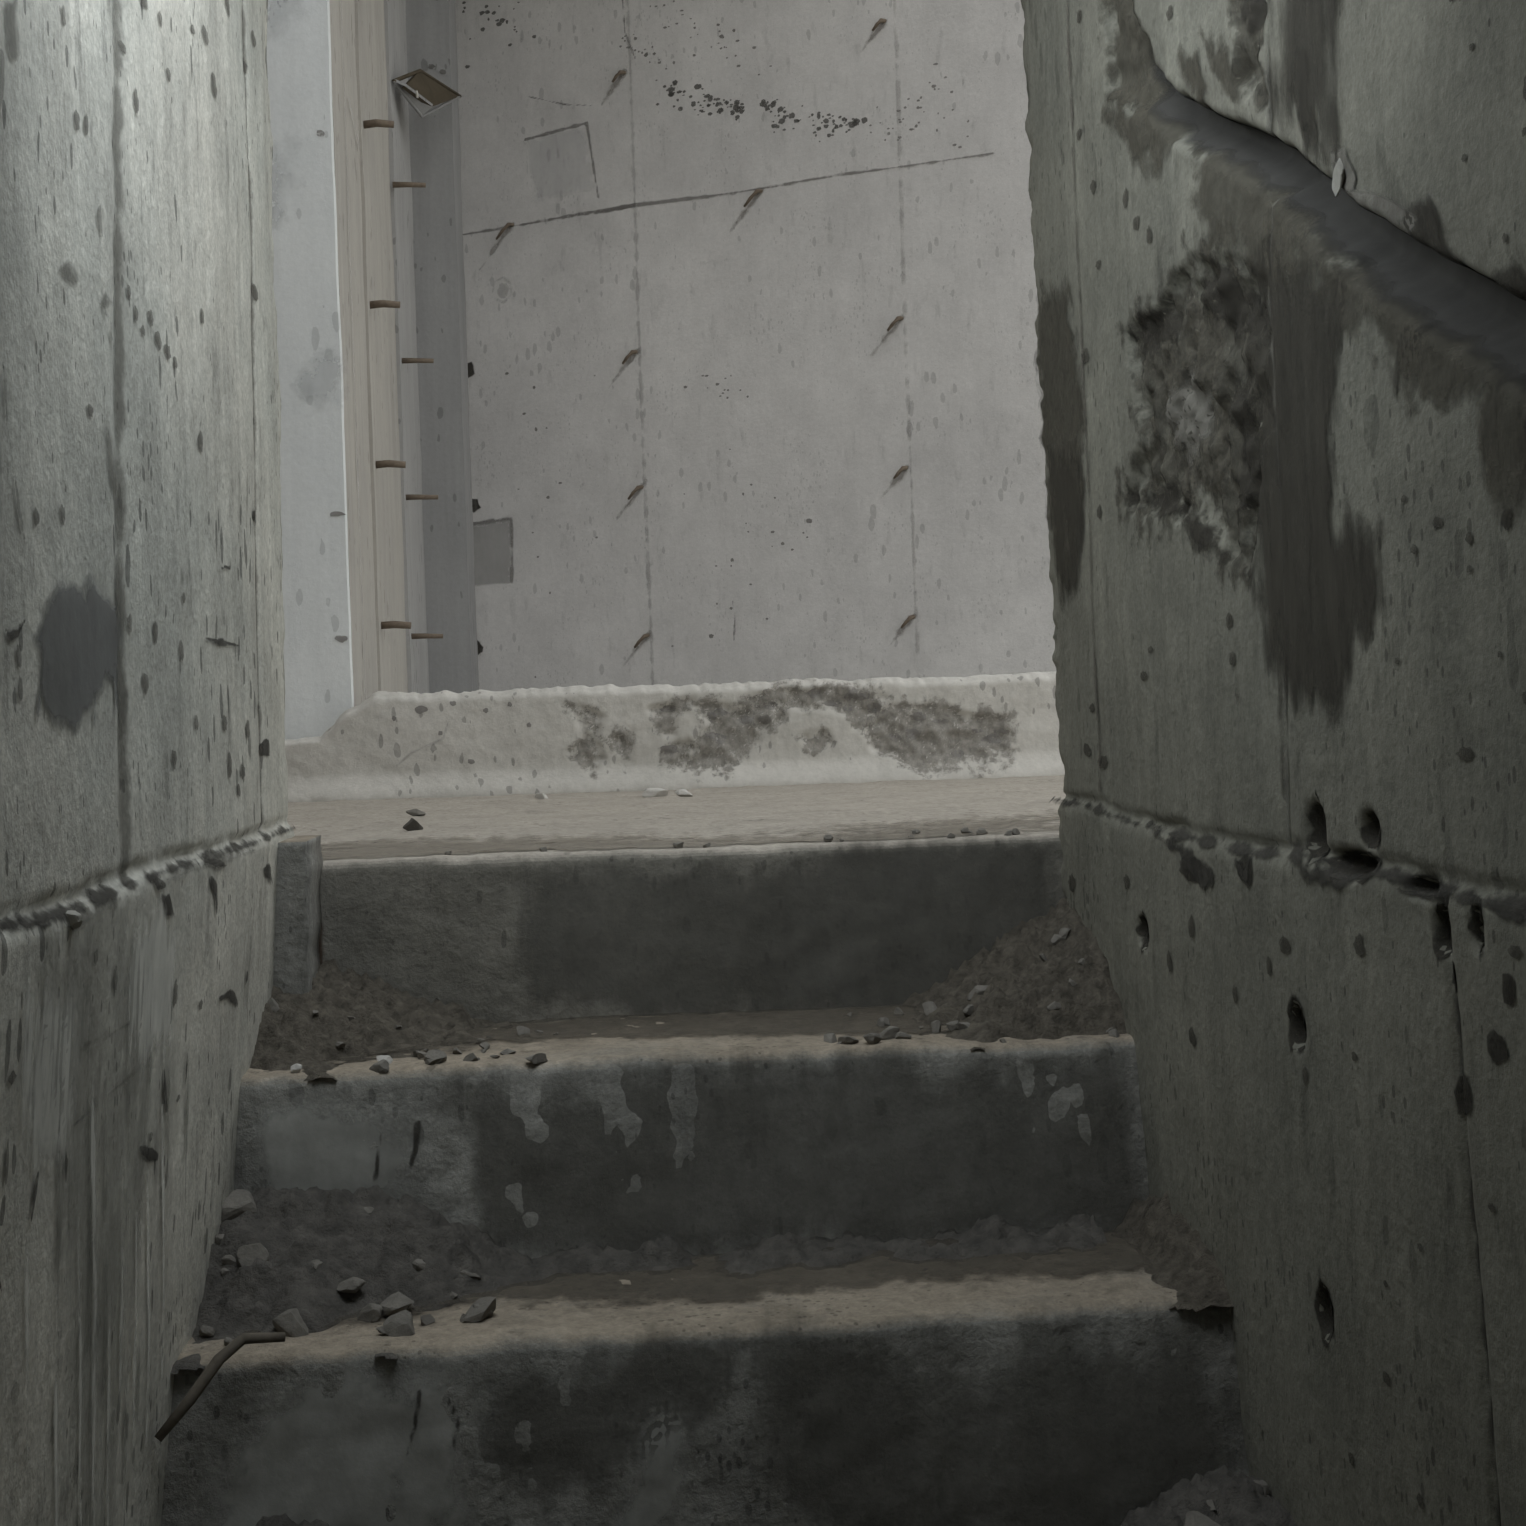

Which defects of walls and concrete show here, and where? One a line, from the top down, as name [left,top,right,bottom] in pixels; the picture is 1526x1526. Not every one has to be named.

damp [1101,97,1526,718]
damp [37,582,127,730]
spalling [147,874,174,916]
spalling [205,858,227,914]
spalling [199,971,248,1009]